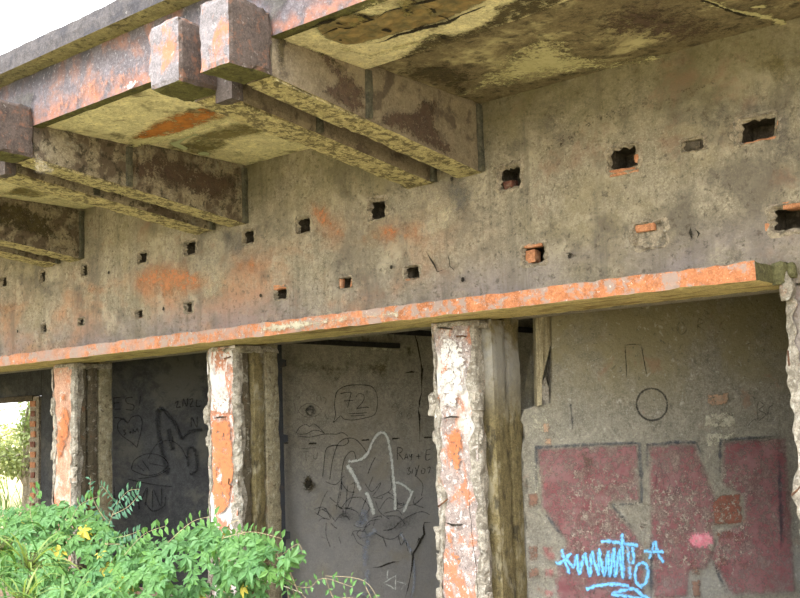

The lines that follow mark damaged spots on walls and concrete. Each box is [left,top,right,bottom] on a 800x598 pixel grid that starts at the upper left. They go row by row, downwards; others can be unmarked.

leakage [277,39,287,66]
leakage [315,50,364,112]
crack [313,0,486,43]
leakage [341,0,561,59]
leakage [398,40,664,95]
leakage [597,2,731,43]
rust [130,109,226,148]
spalling [729,111,782,149]
spalling [764,199,800,239]
spalling [771,261,800,534]
peeling [203,350,247,564]
spalling [428,325,493,598]